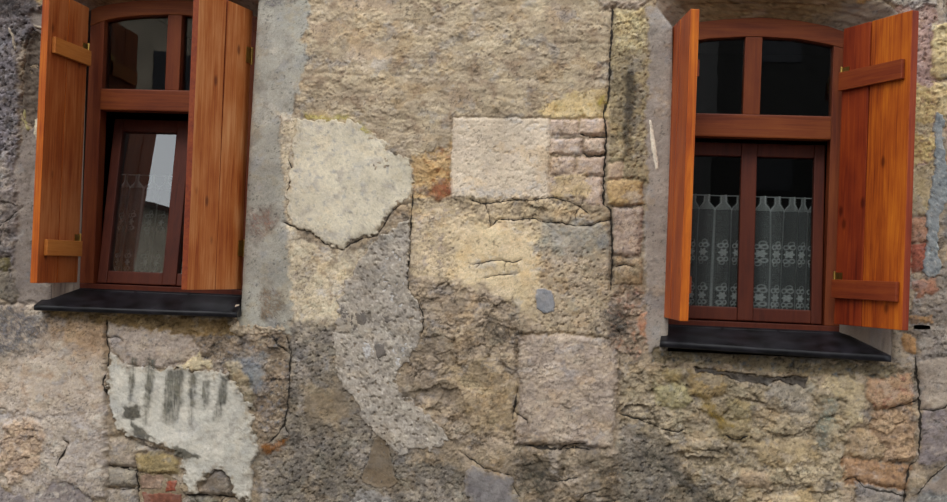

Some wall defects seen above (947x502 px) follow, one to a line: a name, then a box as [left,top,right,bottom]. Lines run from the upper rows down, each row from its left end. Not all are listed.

crack [472,9,633,290]
crack [284,195,424,334]
crack [102,322,123,395]
flaking render [105,349,263,502]
crack [270,336,292,442]
crack [846,356,947,502]